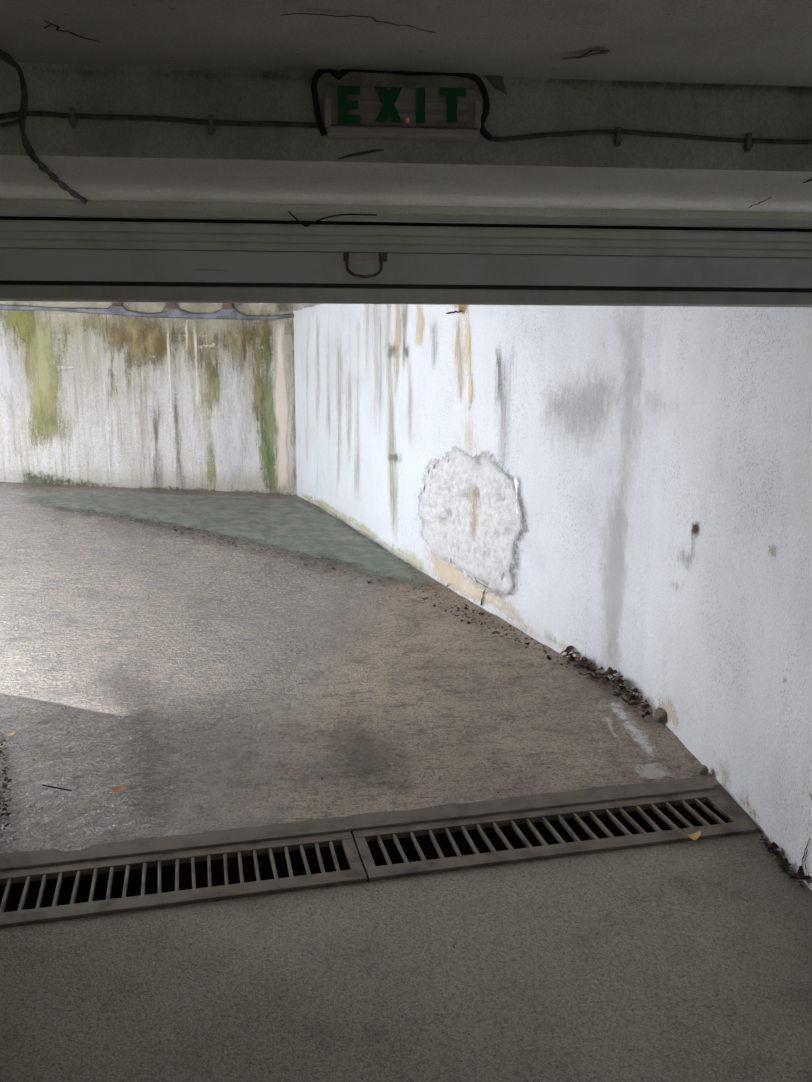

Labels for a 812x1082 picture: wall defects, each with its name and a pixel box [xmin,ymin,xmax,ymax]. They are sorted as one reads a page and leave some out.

damp [14,311,81,444]
damp [94,303,296,491]
damp [387,304,408,521]
damp [398,550,527,628]
flaking render [418,448,527,596]